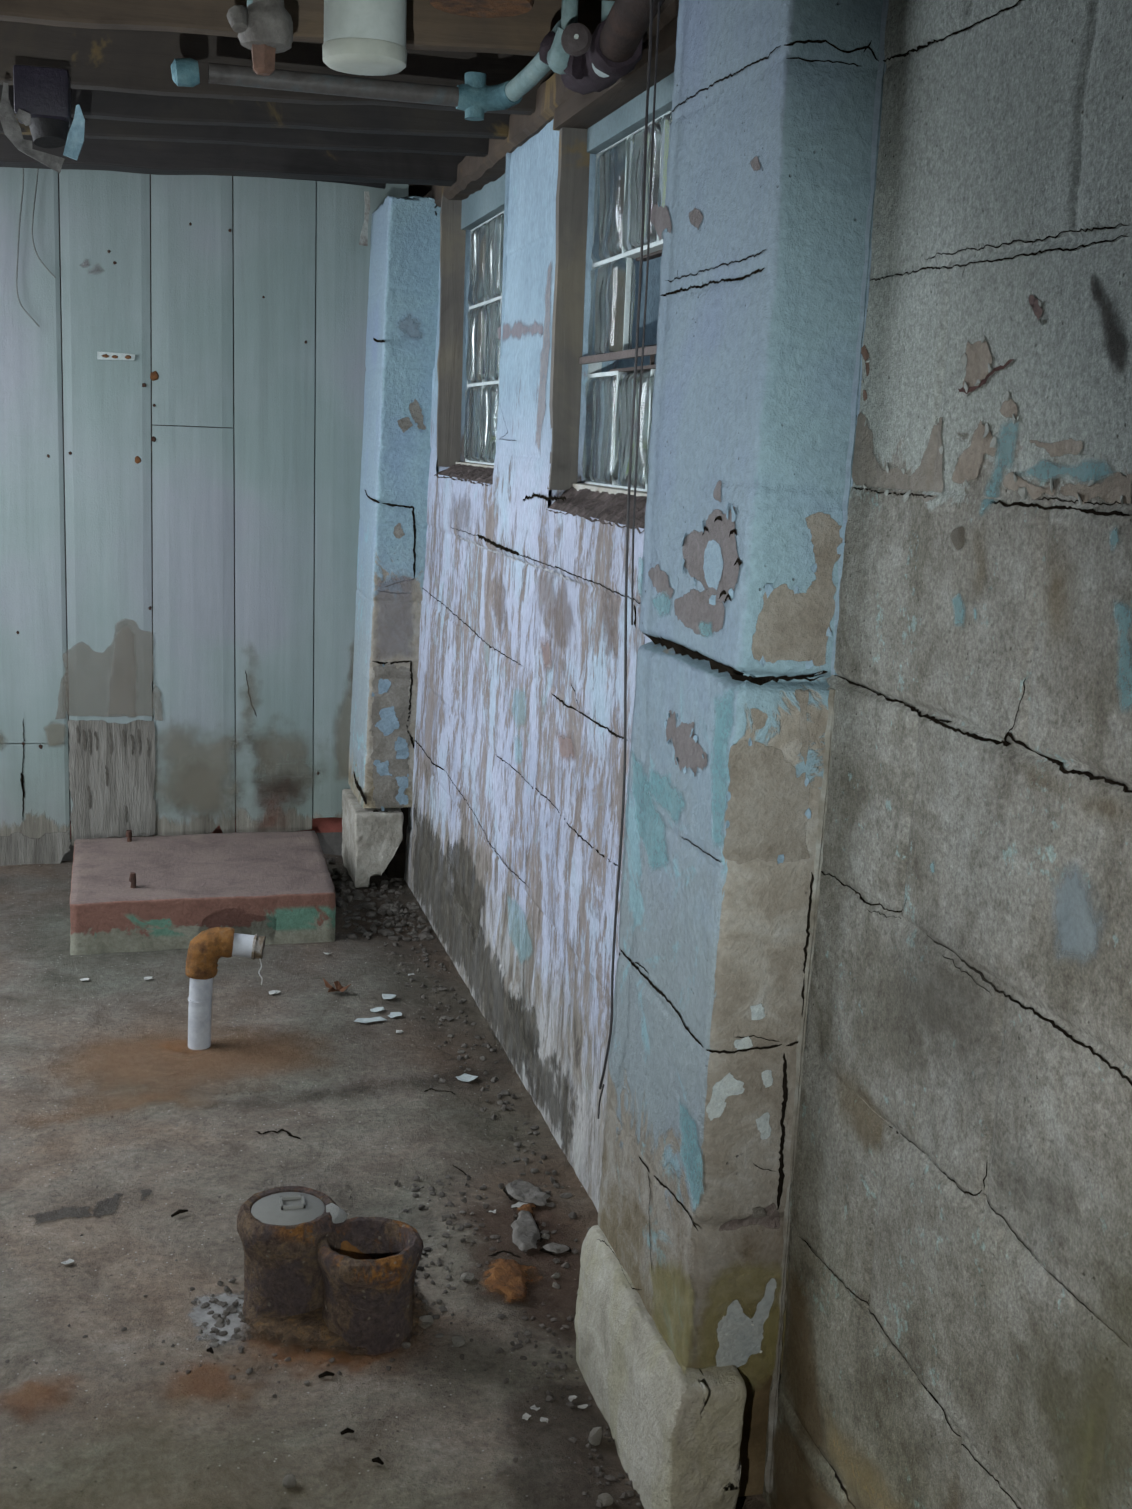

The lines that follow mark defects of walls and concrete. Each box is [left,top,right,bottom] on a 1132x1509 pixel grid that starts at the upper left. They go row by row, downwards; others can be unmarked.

crack [671,0,1024,112]
crack [660,250,765,296]
crack [870,223,1128,281]
peeling [648,480,742,637]
peeling [852,336,1020,503]
peeling [1003,471,1132,506]
crack [364,490,1132,793]
leakage [45,619,312,814]
peeling [369,662,411,811]
corrosion [86,1039,299,1108]
spalling [719,1203,780,1231]
crack [620,871,1132,1509]